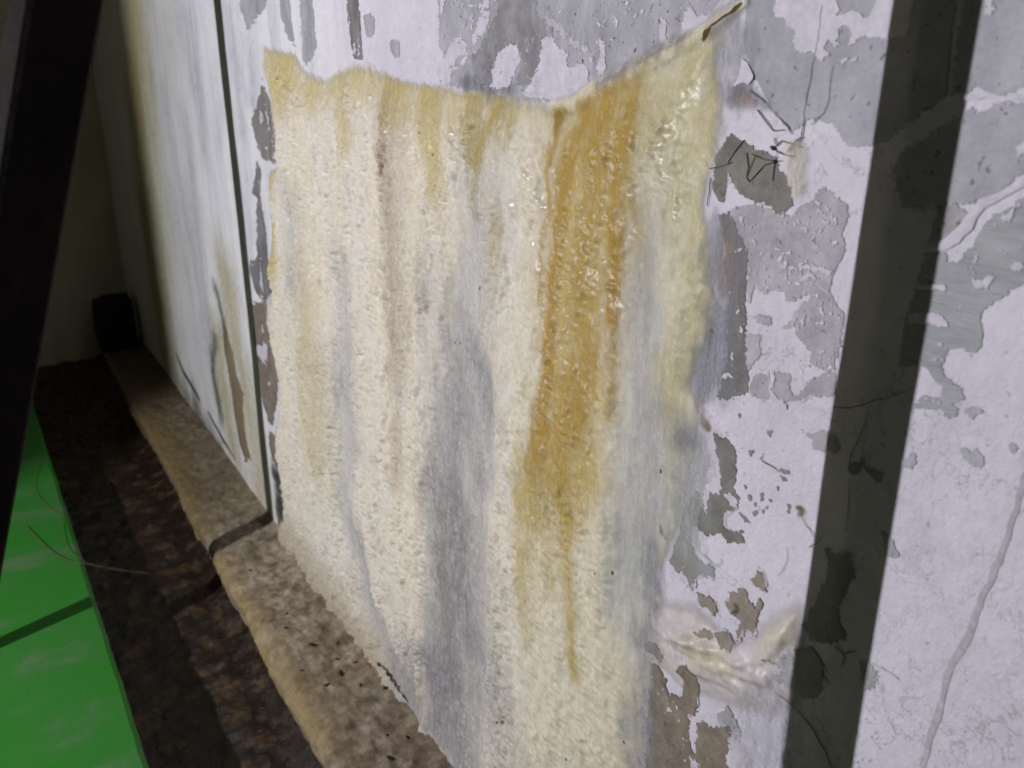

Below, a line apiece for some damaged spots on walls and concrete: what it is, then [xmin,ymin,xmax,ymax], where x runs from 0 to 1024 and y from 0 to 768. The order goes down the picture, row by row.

flaking render [249,86,279,468]
damp [211,0,763,768]
rust [514,78,638,676]
peeling [643,641,741,768]
peeling [668,429,789,653]
peeling [437,0,1024,420]
peeling [761,546,859,699]
peeling [801,429,841,454]
peeling [858,659,879,690]
peeling [881,531,899,558]
crack [919,471,1024,768]
peeling [960,447,984,467]